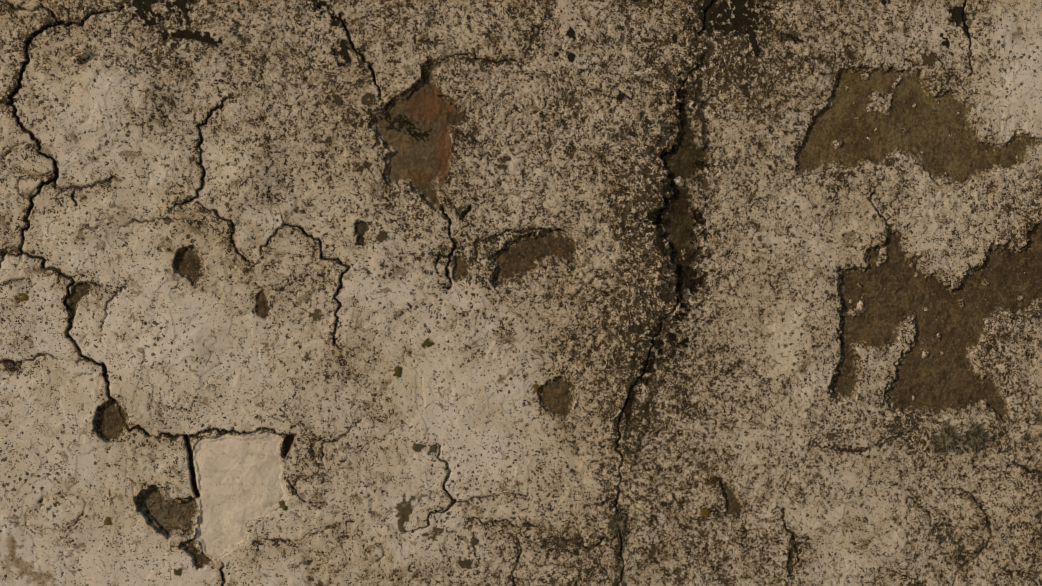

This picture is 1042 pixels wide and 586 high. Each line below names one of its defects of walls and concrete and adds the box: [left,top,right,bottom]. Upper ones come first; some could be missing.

crack [311,0,383,101]
crack [680,0,717,89]
crack [963,0,973,75]
spalling [795,67,1042,185]
crack [0,1,286,497]
crack [122,96,351,345]
spalling [489,229,578,288]
spalling [829,224,1042,420]
spalling [135,432,297,569]
crack [289,431,350,502]